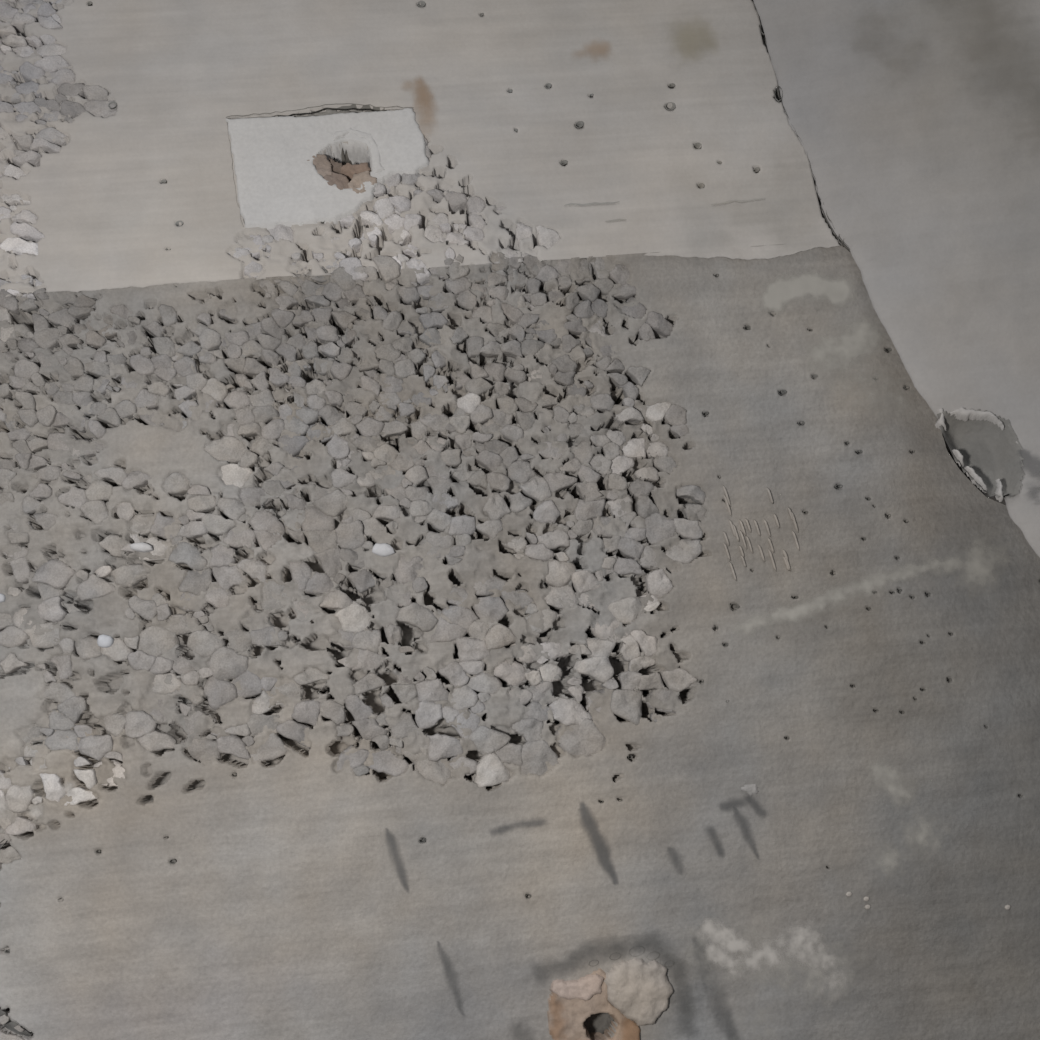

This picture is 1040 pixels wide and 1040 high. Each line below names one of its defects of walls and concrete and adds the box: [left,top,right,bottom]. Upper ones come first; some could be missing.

flaking render [57,83,117,118]
flaking render [0,194,45,256]
flaking render [244,173,504,286]
flaking render [204,436,245,464]
spalling [935,407,1025,502]
flaking render [31,537,168,601]
peeling [97,634,114,648]
flaking render [136,493,698,788]
flaking render [77,710,158,761]
flaking render [39,773,66,802]
flaking render [0,833,21,864]
flaking render [0,1011,25,1040]